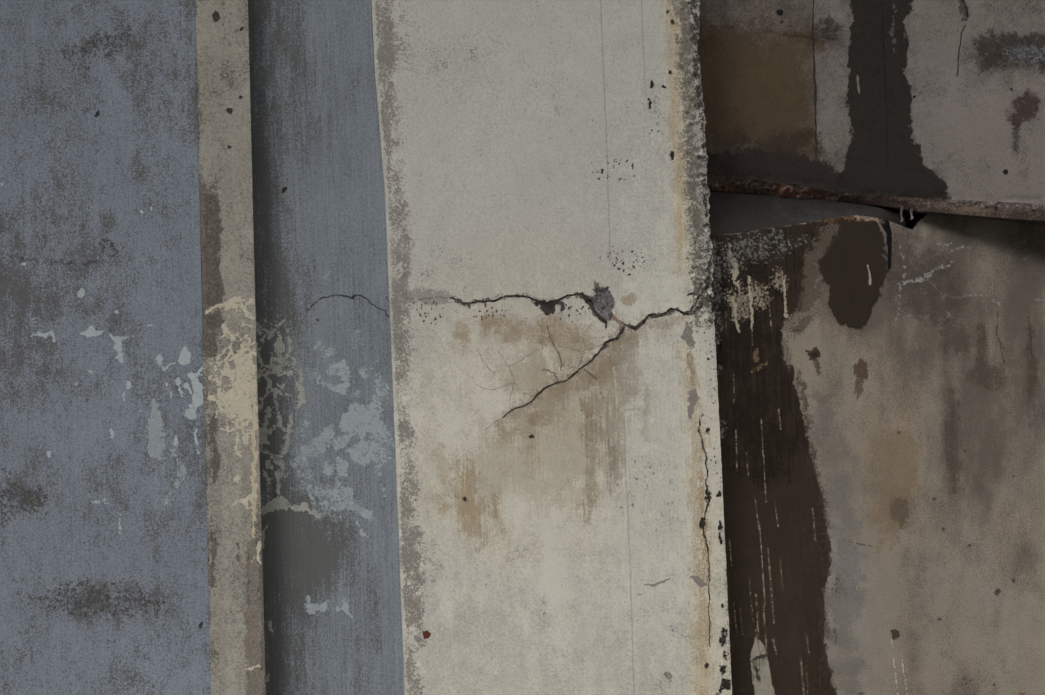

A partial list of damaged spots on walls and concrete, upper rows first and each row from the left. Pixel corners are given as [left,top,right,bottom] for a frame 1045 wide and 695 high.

crack [956,0,969,77]
water stain [833,0,952,200]
rust [815,215,885,227]
crack [307,294,390,321]
crack [450,278,716,418]
water stain [673,0,889,695]
water stain [895,240,1032,322]
peeling [207,414,221,483]
peeling [208,531,219,587]
crack [698,414,712,647]